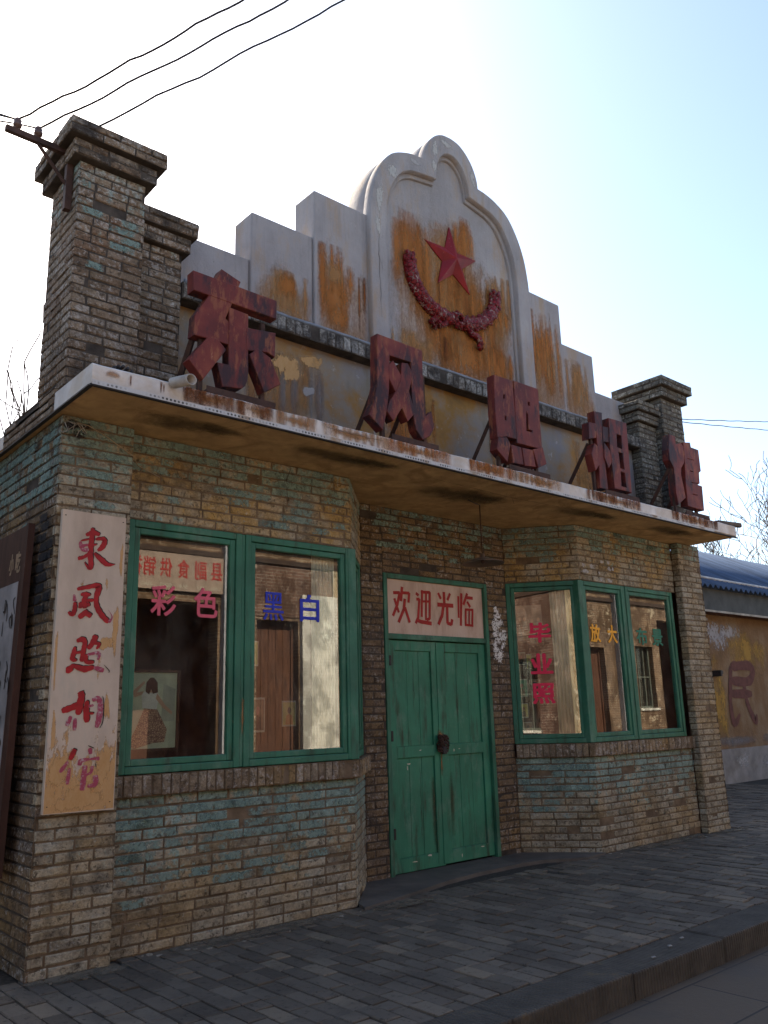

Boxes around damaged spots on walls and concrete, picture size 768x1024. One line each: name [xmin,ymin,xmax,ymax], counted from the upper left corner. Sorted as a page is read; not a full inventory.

corrosion [260,273,307,319]
corrosion [318,242,366,339]
corrosion [392,216,514,382]
corrosion [531,310,594,417]
corrosion [183,364,450,464]
leakage [306,450,388,466]